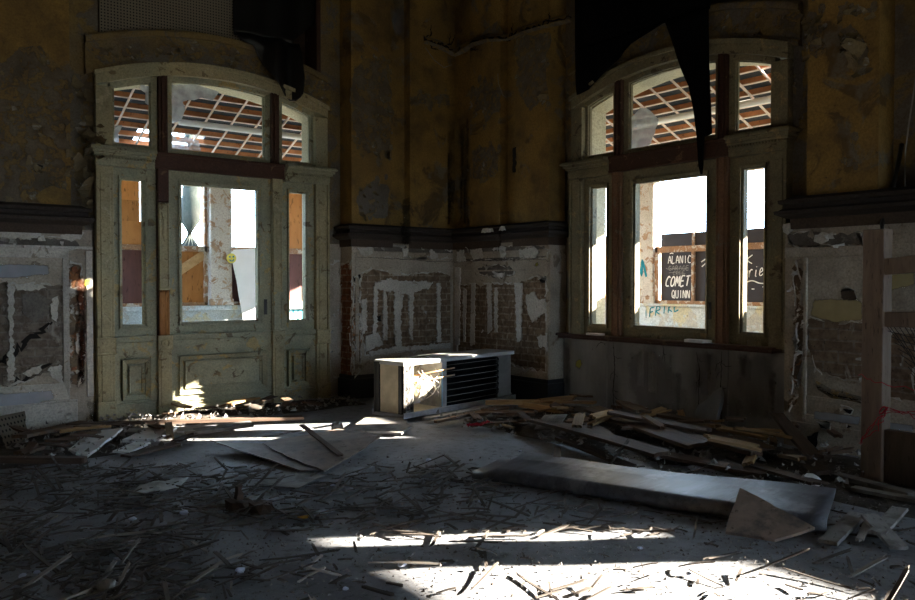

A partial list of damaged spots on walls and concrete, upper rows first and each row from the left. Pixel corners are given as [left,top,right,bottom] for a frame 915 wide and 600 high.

crack [424,13,572,57]
flaking render [782,223,863,248]
crack [0,322,53,387]
flaking render [0,232,86,389]
flaking render [339,245,550,379]
flaking render [787,260,862,412]
flaking render [891,328,915,401]